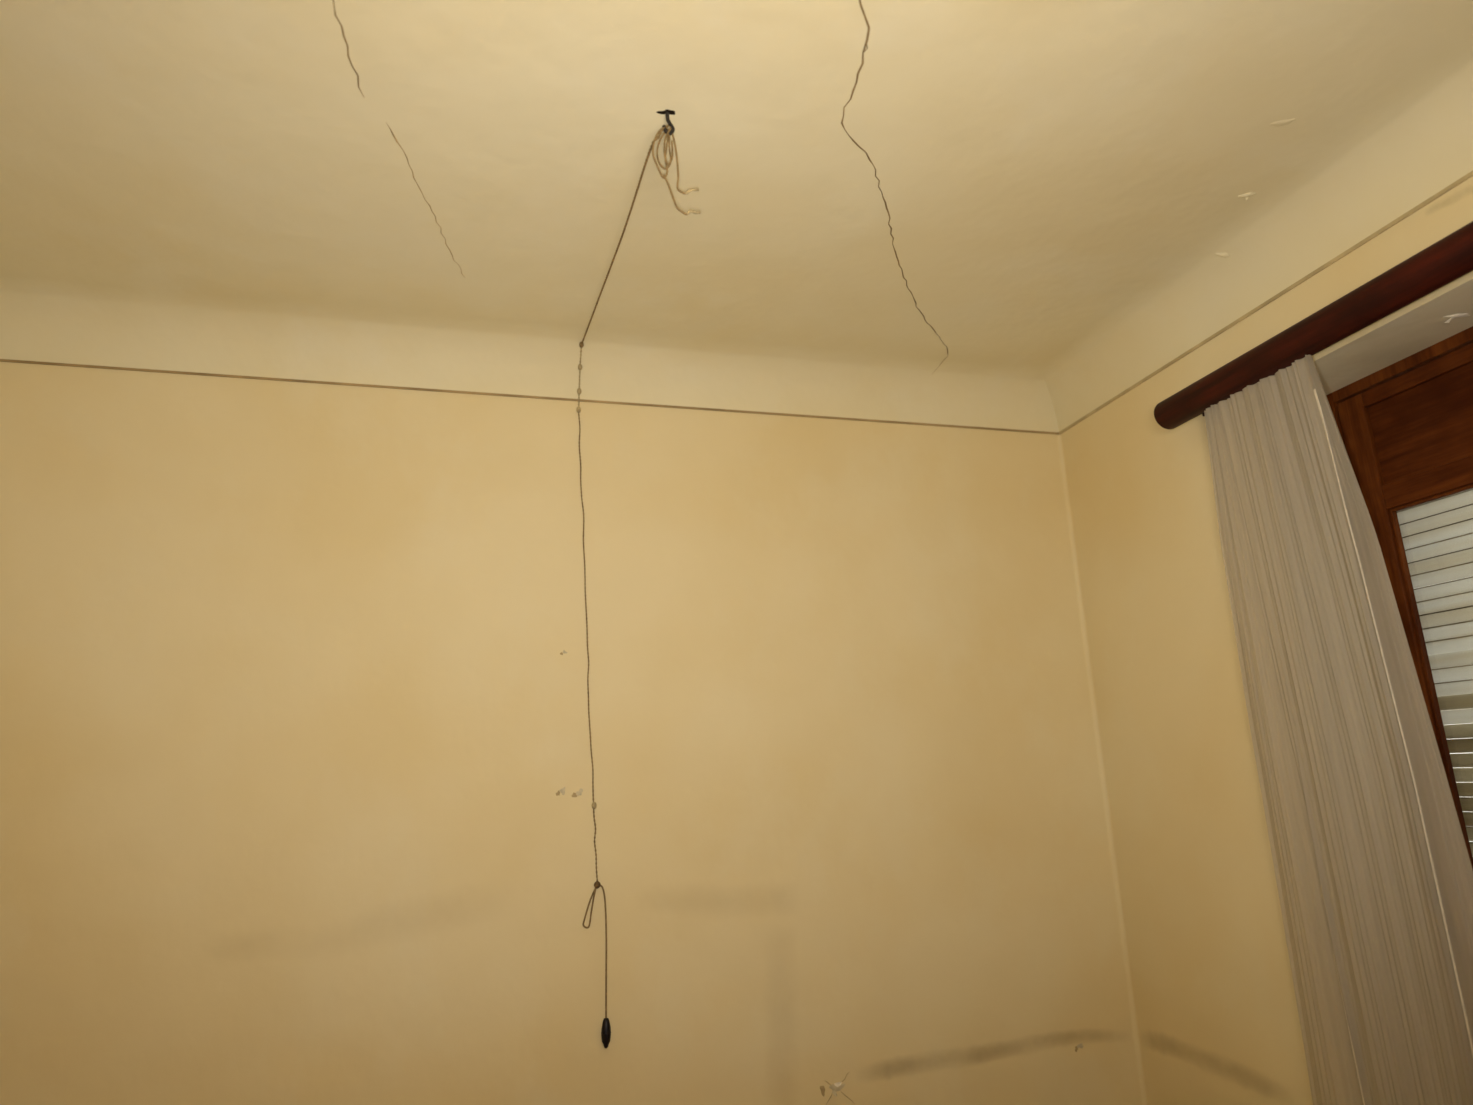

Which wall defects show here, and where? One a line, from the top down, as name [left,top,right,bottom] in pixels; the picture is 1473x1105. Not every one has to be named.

crack [333,0,464,276]
crack [841,0,948,375]